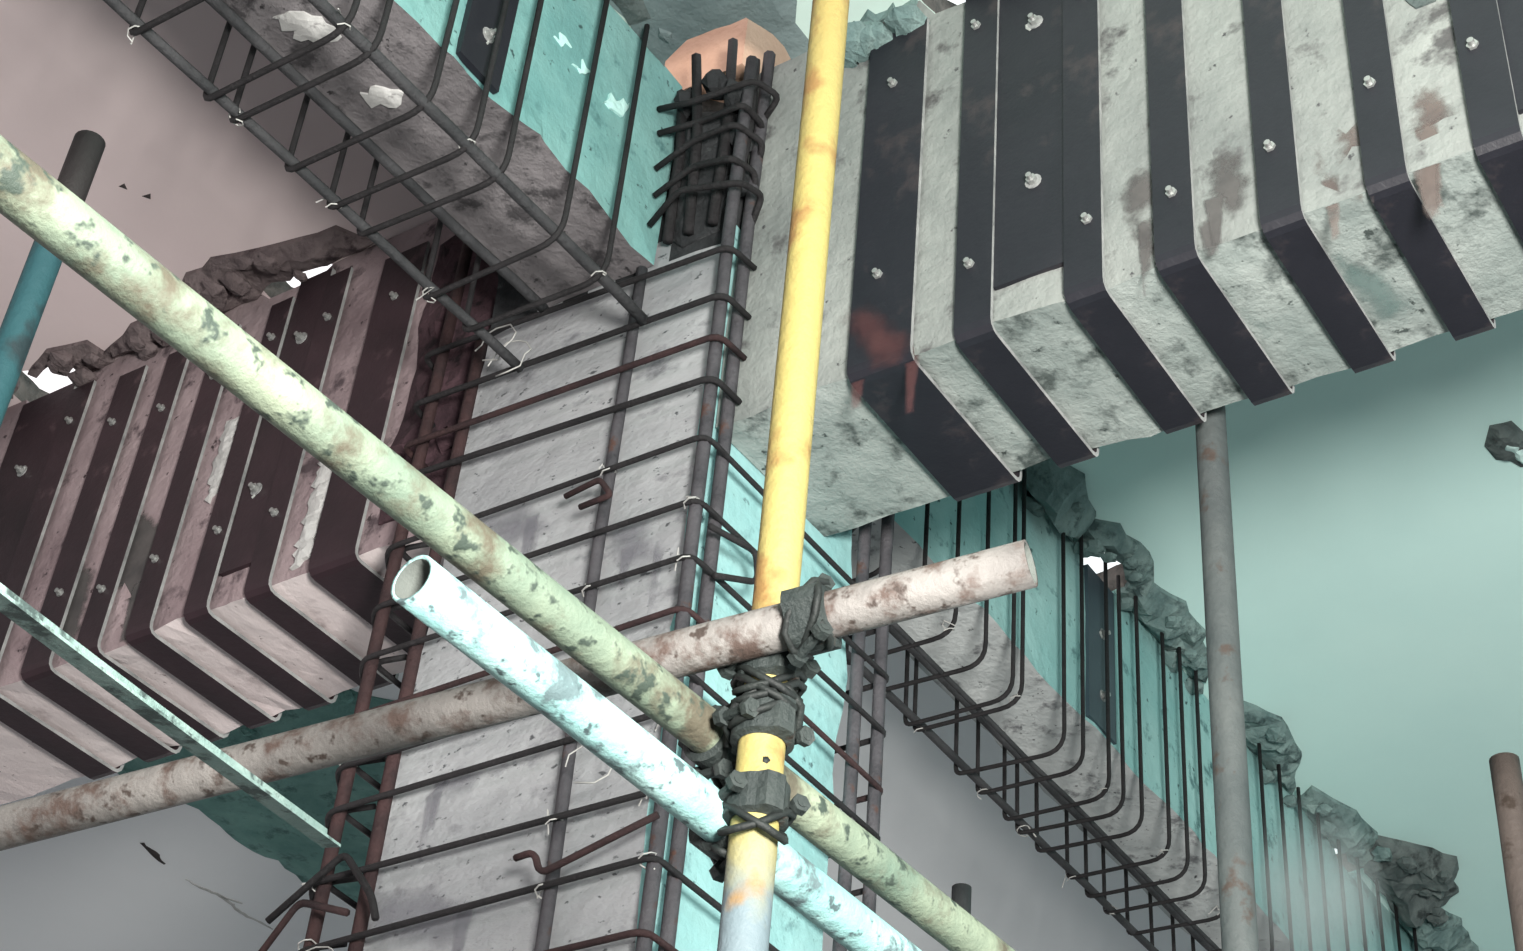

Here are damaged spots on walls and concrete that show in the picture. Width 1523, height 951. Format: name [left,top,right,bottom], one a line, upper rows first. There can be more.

peeling [553,32,590,75]
spalling [609,0,809,67]
peeling [603,93,630,118]
spalling [673,69,756,248]
spalling [182,225,374,314]
spalling [11,320,169,399]
rust [859,316,916,410]
spalling [1484,421,1523,467]
spalling [1020,458,1208,695]
spalling [1243,700,1479,951]